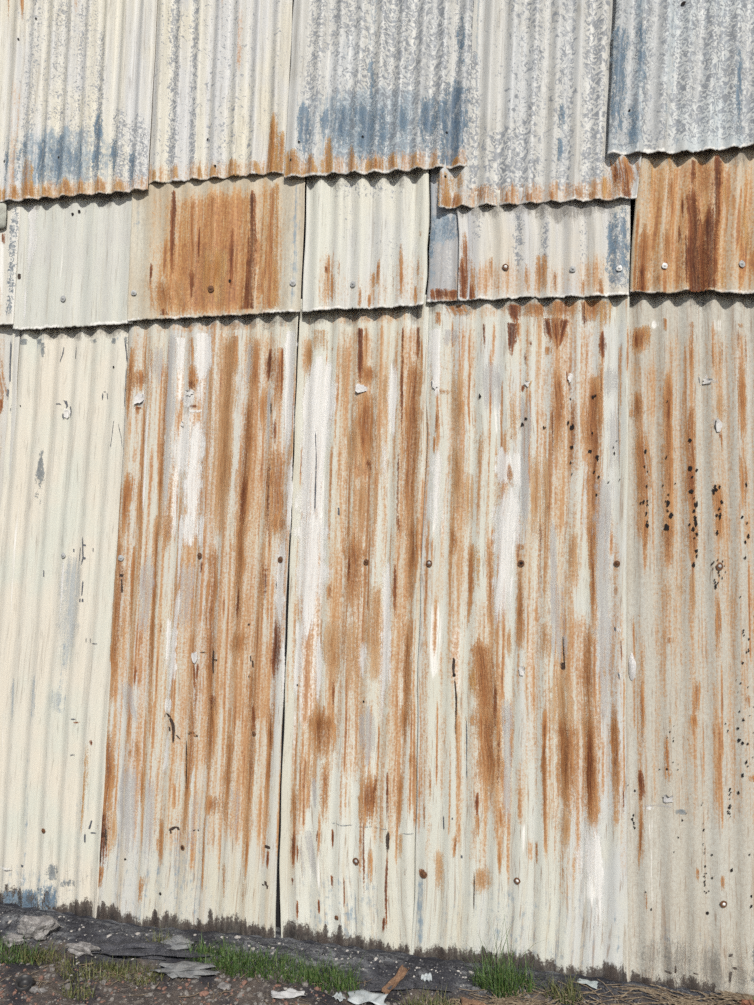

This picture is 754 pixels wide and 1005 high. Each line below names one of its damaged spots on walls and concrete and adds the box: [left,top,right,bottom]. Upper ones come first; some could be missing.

corrosion [148,116,336,315]
corrosion [634,154,723,292]
corrosion [109,374,173,700]
corrosion [189,335,286,618]
corrosion [290,327,439,865]
corrosion [507,255,624,863]
corrosion [629,373,698,562]
leakage [1,864,75,910]
corrosion [97,730,117,887]
corrosion [183,548,234,888]
corrosion [242,666,274,900]
corrosion [358,774,403,930]